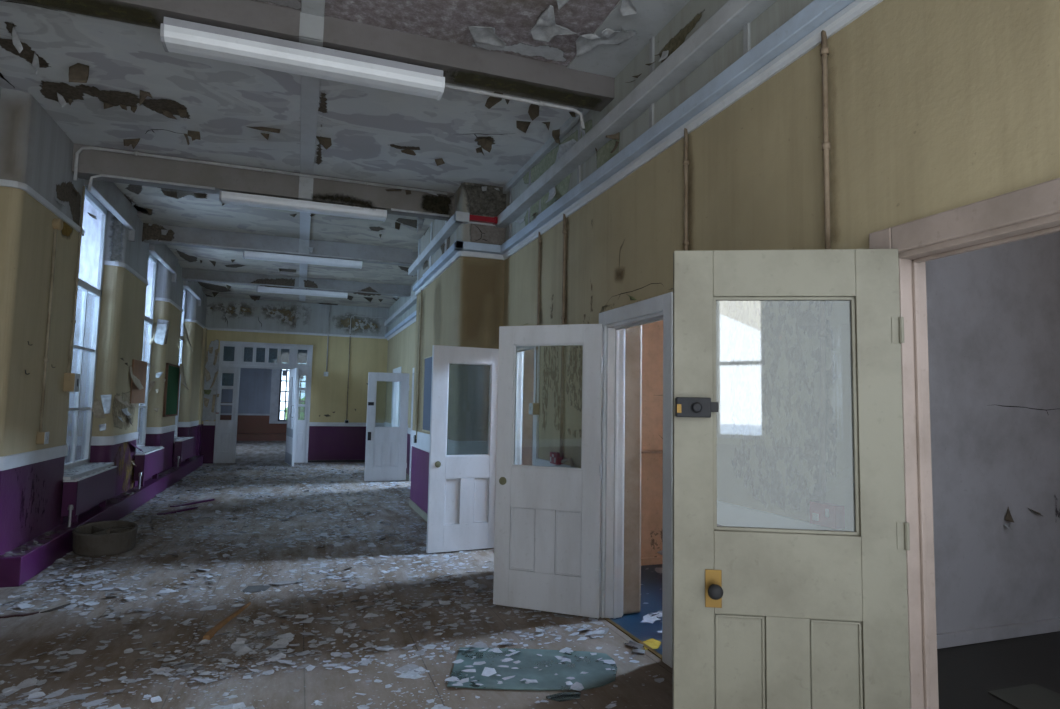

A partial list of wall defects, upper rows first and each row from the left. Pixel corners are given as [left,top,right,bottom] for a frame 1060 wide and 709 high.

peeling [625,10,705,83]
peeling [0,22,201,145]
peeling [315,93,332,165]
peeling [390,144,420,156]
peeling [485,92,510,109]
peeling [54,181,97,226]
peeling [124,184,245,268]
peeling [369,217,428,238]
peeling [249,268,318,301]
peeling [149,319,170,345]
peeling [91,358,166,431]
peeling [0,456,664,709]